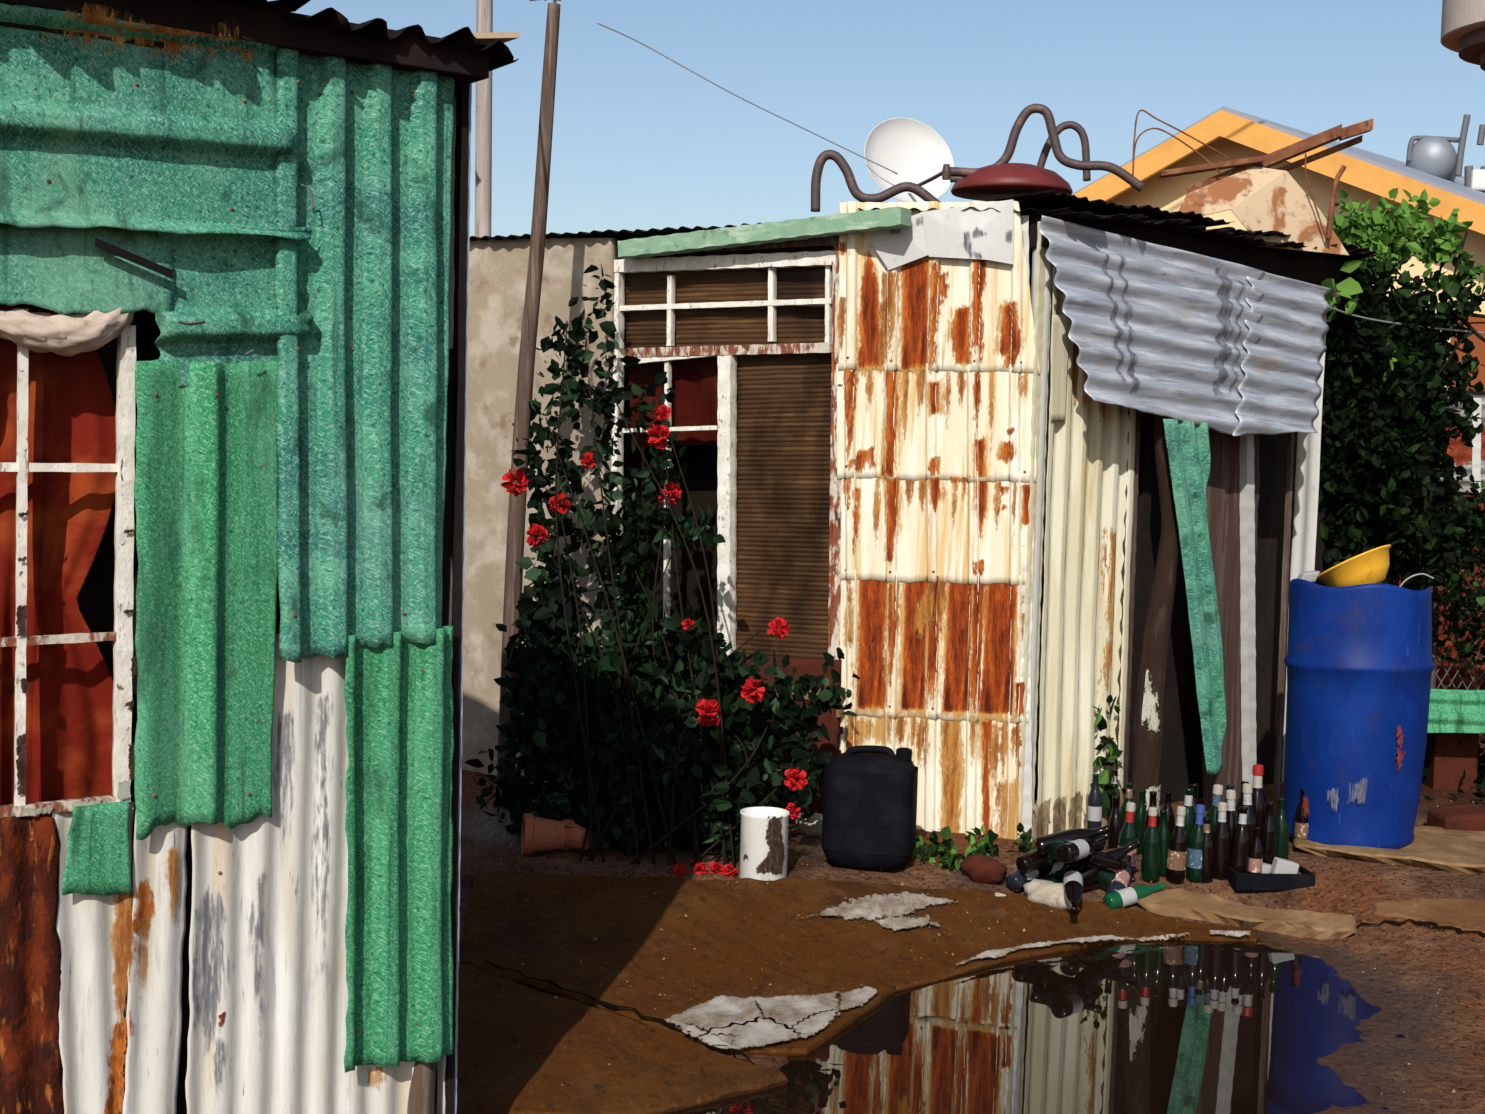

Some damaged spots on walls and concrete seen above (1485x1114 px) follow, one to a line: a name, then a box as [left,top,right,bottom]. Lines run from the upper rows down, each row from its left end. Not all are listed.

rust [837,251,1036,840]
rust [1441,425,1485,467]
rust [104,847,180,1114]